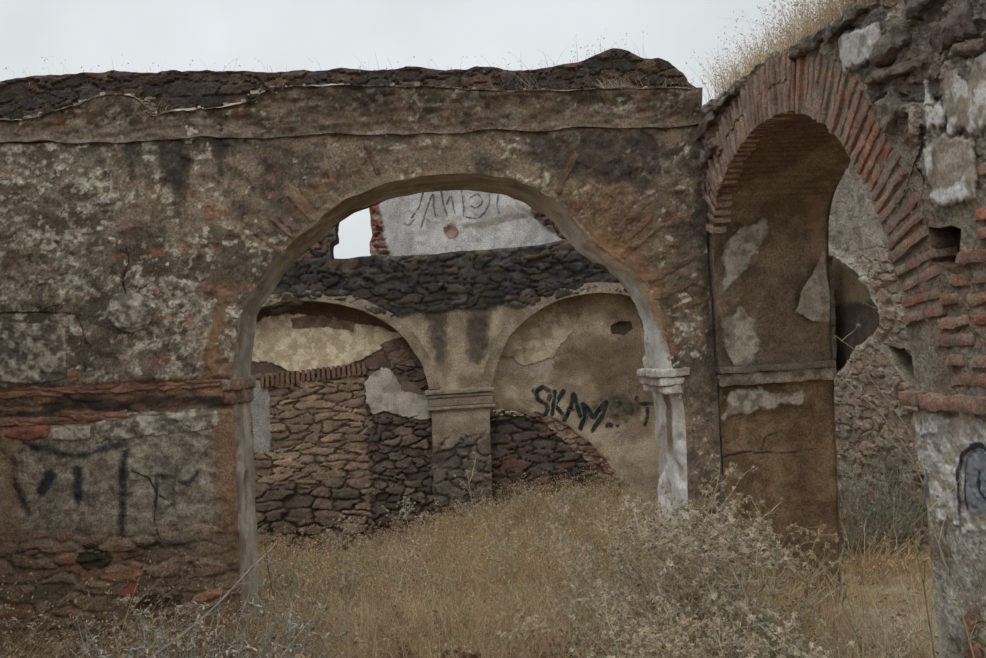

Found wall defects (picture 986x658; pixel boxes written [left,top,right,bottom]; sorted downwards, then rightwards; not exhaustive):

peeling [721,219,769,291]
crack [0,304,96,344]
damp [353,285,388,307]
flaking render [381,337,429,395]
damp [419,288,448,362]
damp [467,286,490,363]
peeling [721,307,760,366]
peeling [721,388,805,421]